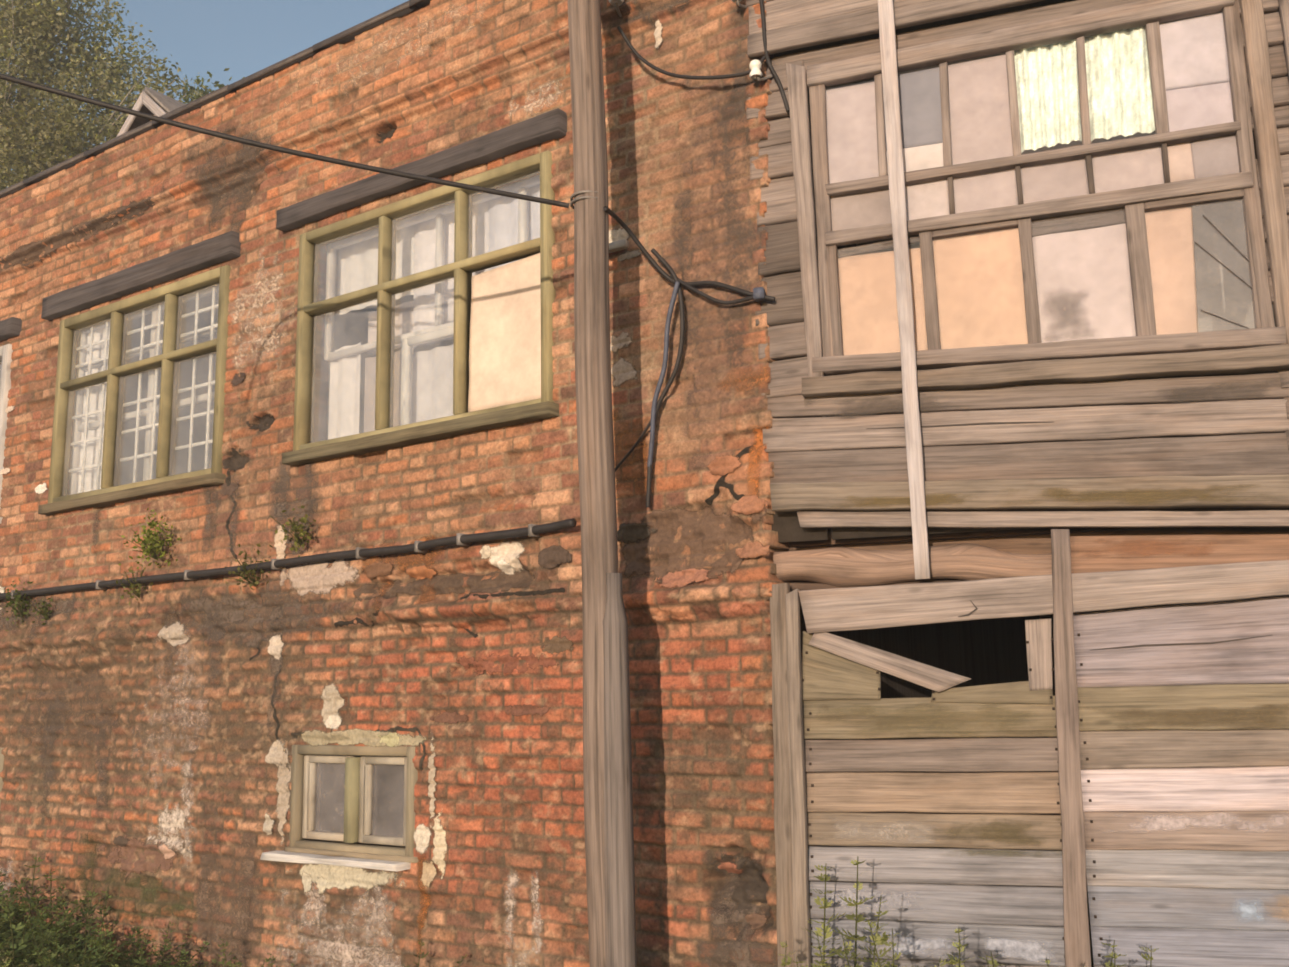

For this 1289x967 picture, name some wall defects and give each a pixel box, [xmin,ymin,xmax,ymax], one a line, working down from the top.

crack [225,471,237,559]
spalling [274,525,572,602]
spalling [617,495,771,588]
crack [705,442,756,505]
water stain [0,595,77,643]
crack [249,608,302,740]
water stain [56,580,340,967]
peeling [263,740,291,844]
peeling [302,683,468,887]
crack [375,726,426,770]
water stain [279,886,401,967]
water stain [698,856,777,967]